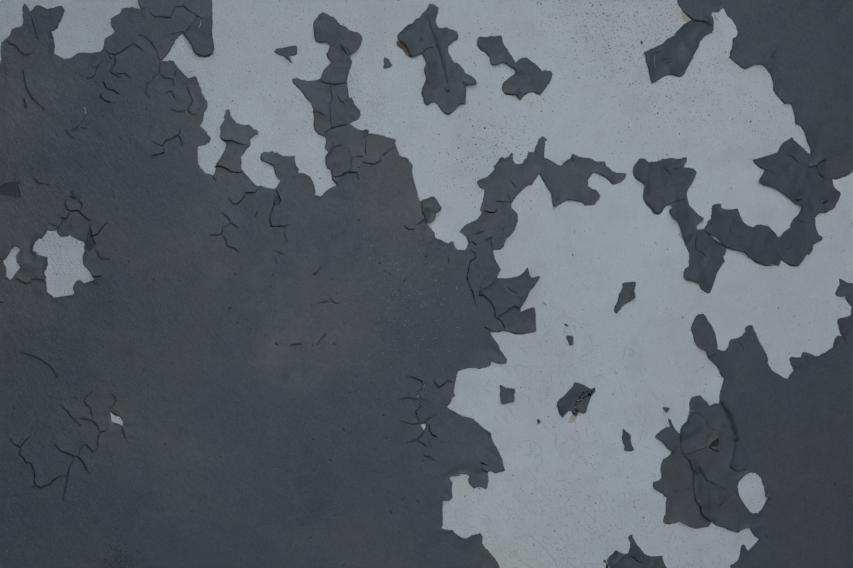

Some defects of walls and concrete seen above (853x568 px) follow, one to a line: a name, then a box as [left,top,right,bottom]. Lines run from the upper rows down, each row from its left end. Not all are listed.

peeling [0,0,141,67]
crack [150,6,209,34]
crack [91,36,196,156]
peeling [4,246,20,279]
peeling [33,230,94,297]
crack [13,393,125,498]
crack [404,376,453,460]
crack [448,316,742,568]
peeling [738,472,768,513]